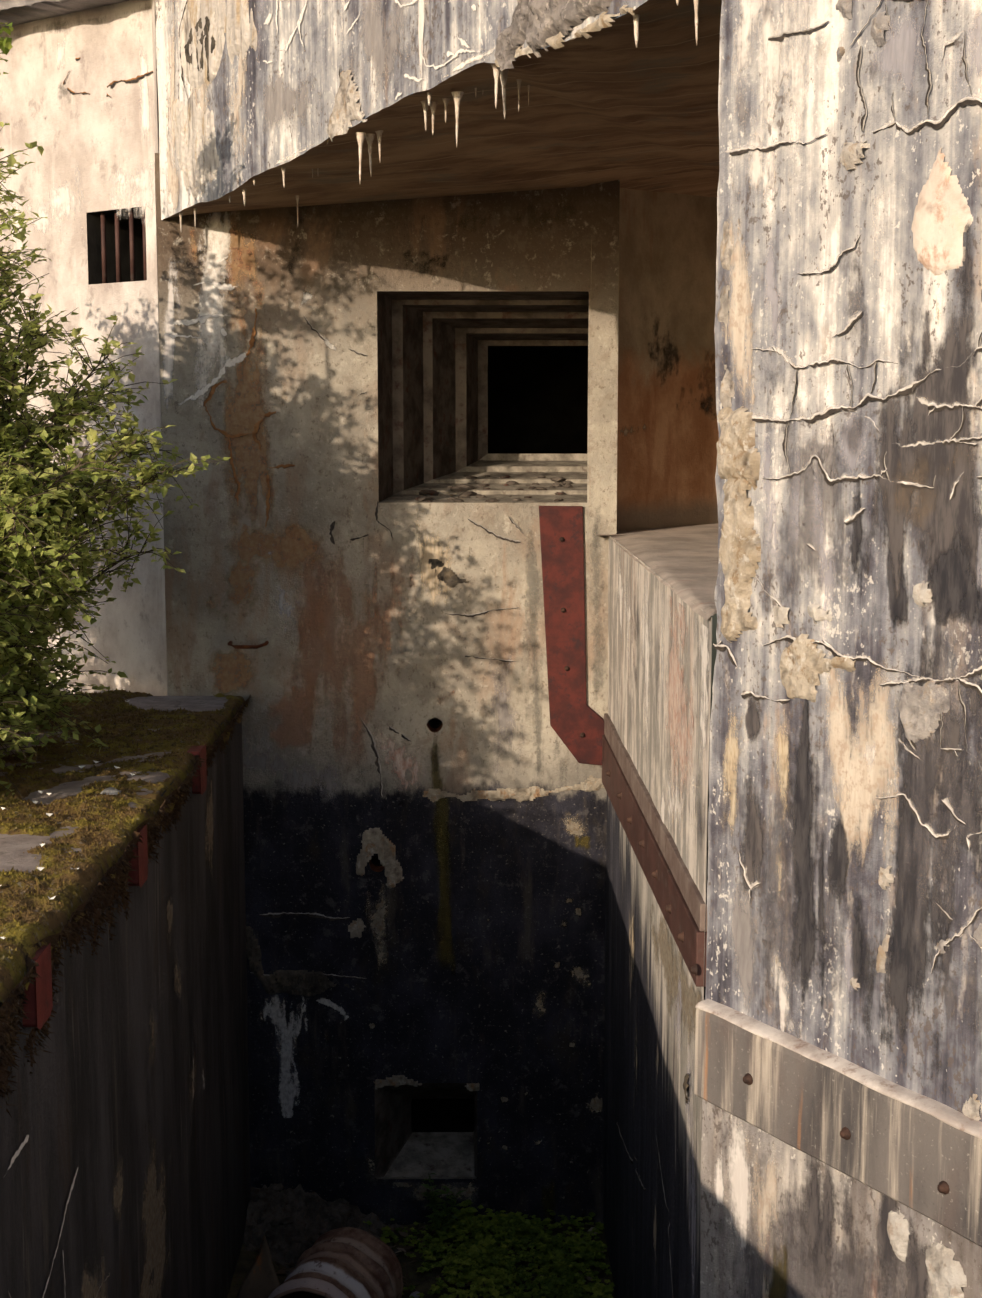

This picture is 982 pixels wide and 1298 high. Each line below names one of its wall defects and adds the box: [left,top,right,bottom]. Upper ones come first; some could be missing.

damp [351,0,424,86]
damp [443,49,493,78]
spalling [494,0,635,71]
crack [768,0,982,135]
peeling [911,147,973,276]
corrosion [225,226,256,292]
crack [751,289,982,525]
crack [713,575,982,769]
spalling [356,828,404,889]
damp [732,668,982,1044]
crack [875,794,982,850]
peeling [887,1211,967,1298]